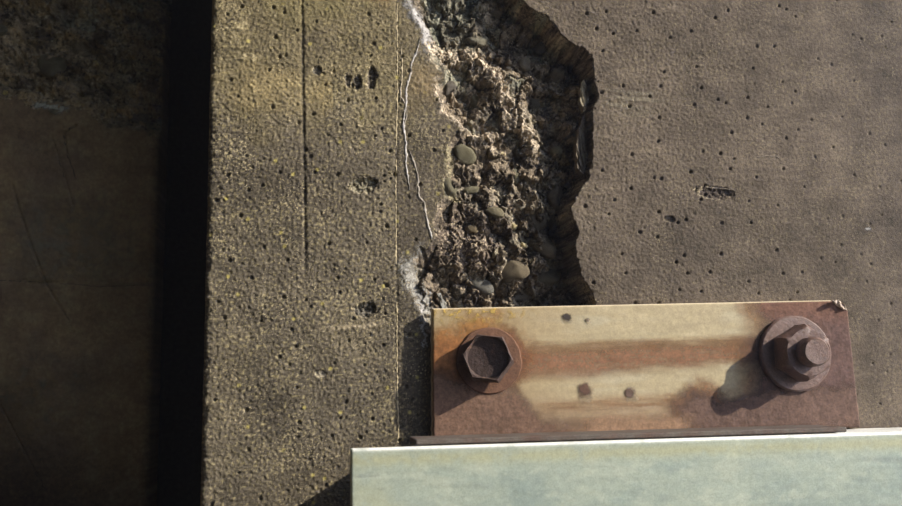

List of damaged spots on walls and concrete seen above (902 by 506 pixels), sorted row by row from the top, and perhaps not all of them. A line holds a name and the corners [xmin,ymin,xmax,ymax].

crack [394,3,432,264]
spalling [405,0,599,333]
crack [393,302,401,443]
corrosion [433,301,860,436]